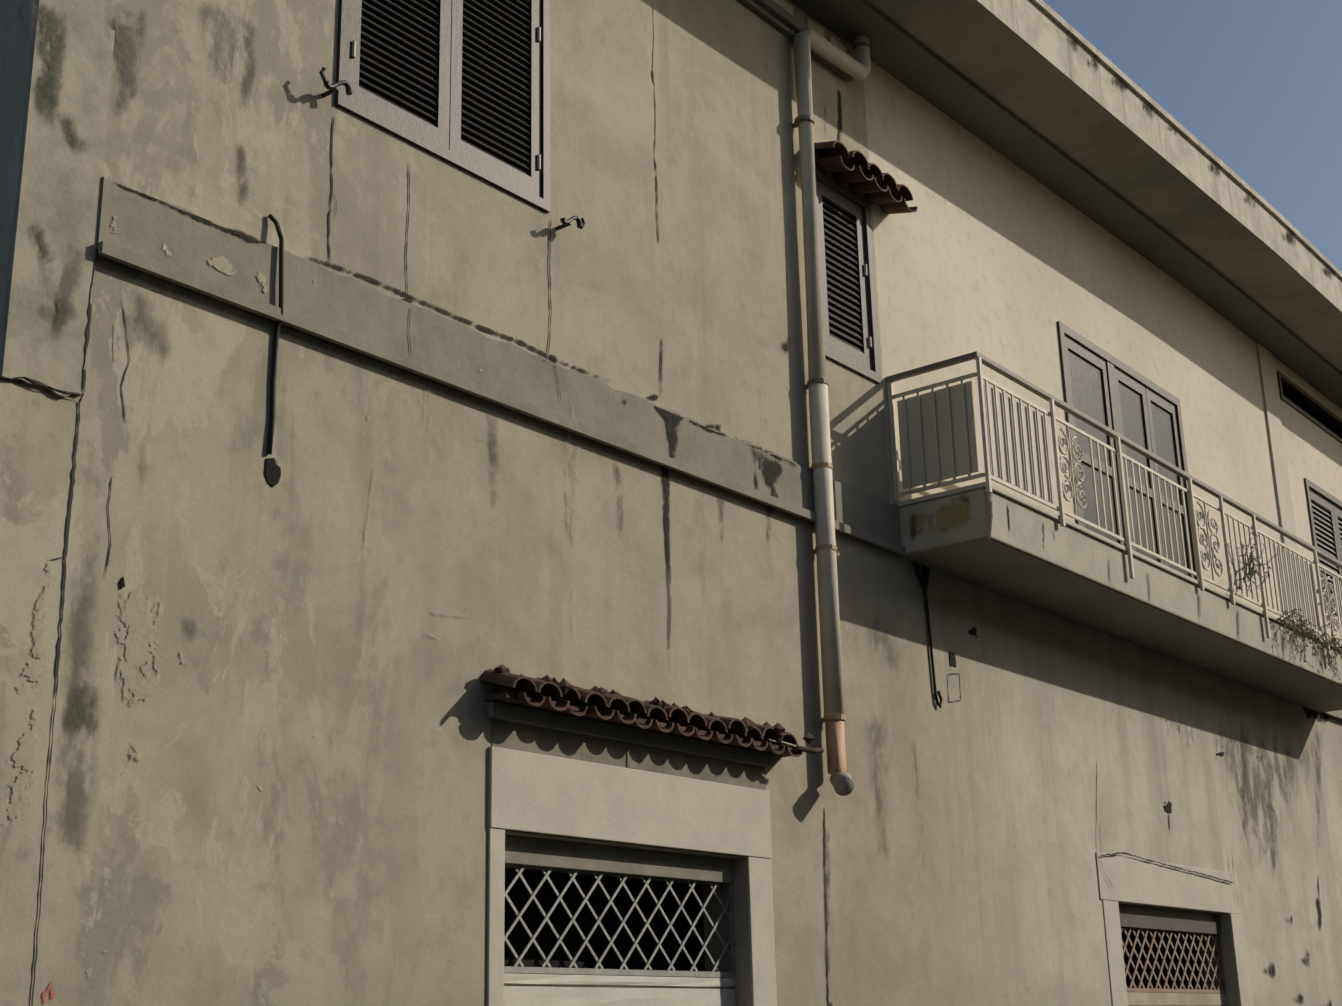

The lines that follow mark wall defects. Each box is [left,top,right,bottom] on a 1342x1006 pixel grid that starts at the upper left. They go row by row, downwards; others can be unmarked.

leakage [63,118,84,148]
crack [328,117,337,263]
crack [651,12,659,242]
peeling [208,256,236,276]
peeling [256,271,268,293]
crack [404,167,412,351]
leakage [648,340,796,648]
leakage [1303,707,1329,746]
leakage [1227,732,1294,868]